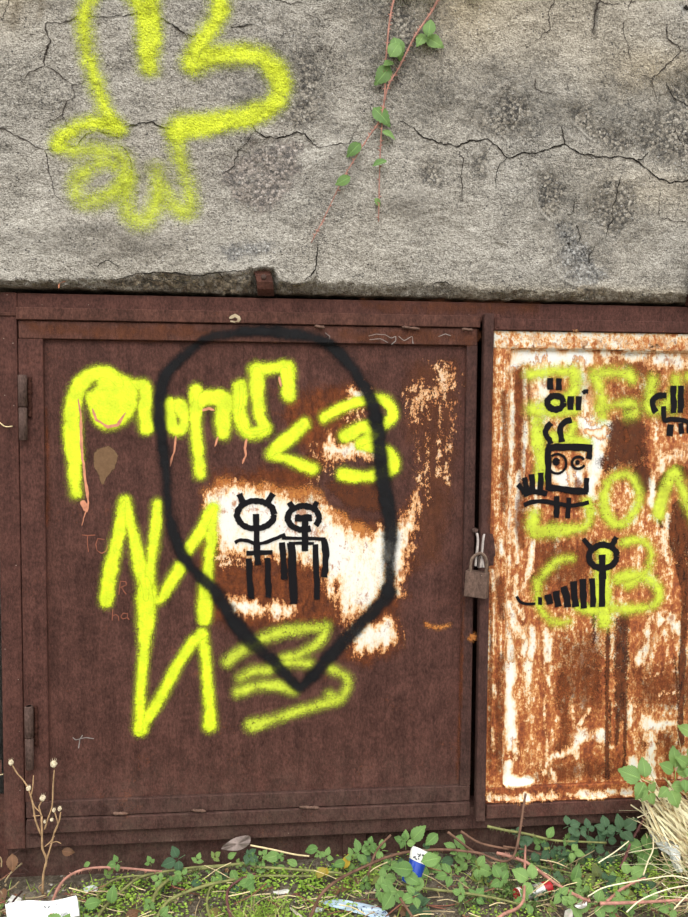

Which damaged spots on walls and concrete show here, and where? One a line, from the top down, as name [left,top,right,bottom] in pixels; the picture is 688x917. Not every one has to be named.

crack [0,12,205,203]
crack [223,125,366,174]
crack [400,121,688,267]
crack [592,0,643,56]
crack [644,27,688,107]
rust [198,536,364,632]
rust [203,384,384,539]
peeling [200,360,463,661]
rust [491,366,531,548]
peeling [485,329,688,805]
rust [597,362,688,492]
rust [488,577,505,771]